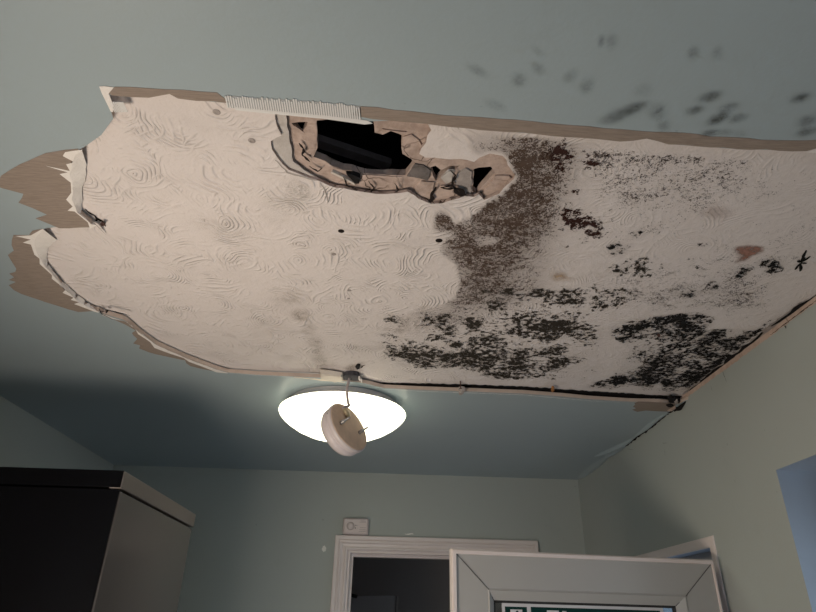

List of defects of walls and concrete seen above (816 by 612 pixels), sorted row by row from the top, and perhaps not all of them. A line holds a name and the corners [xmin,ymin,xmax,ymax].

peeling [99,86,114,112]
spalling [48,150,106,235]
spalling [17,229,227,373]
damp [376,137,797,399]
flaking render [666,294,816,413]
damp [793,250,814,271]